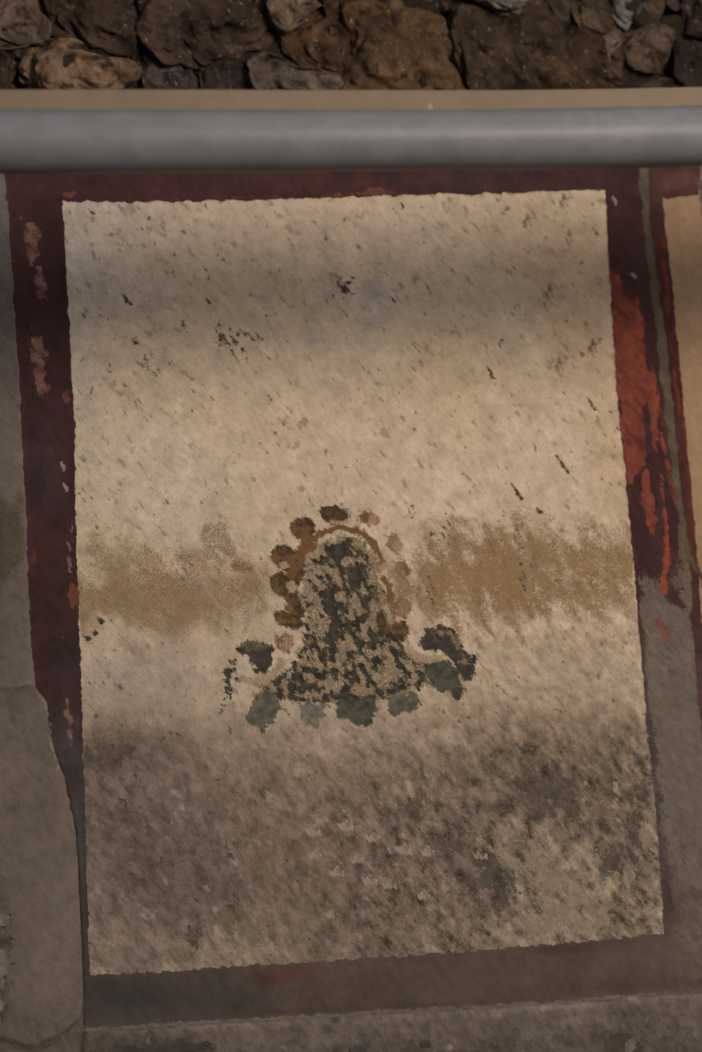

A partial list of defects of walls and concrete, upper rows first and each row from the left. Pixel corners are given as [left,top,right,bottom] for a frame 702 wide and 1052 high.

water stain [323,274,397,334]
water stain [76,519,300,671]
water stain [345,168,702,971]
spalling [0,878,17,1022]
water stain [178,906,211,963]